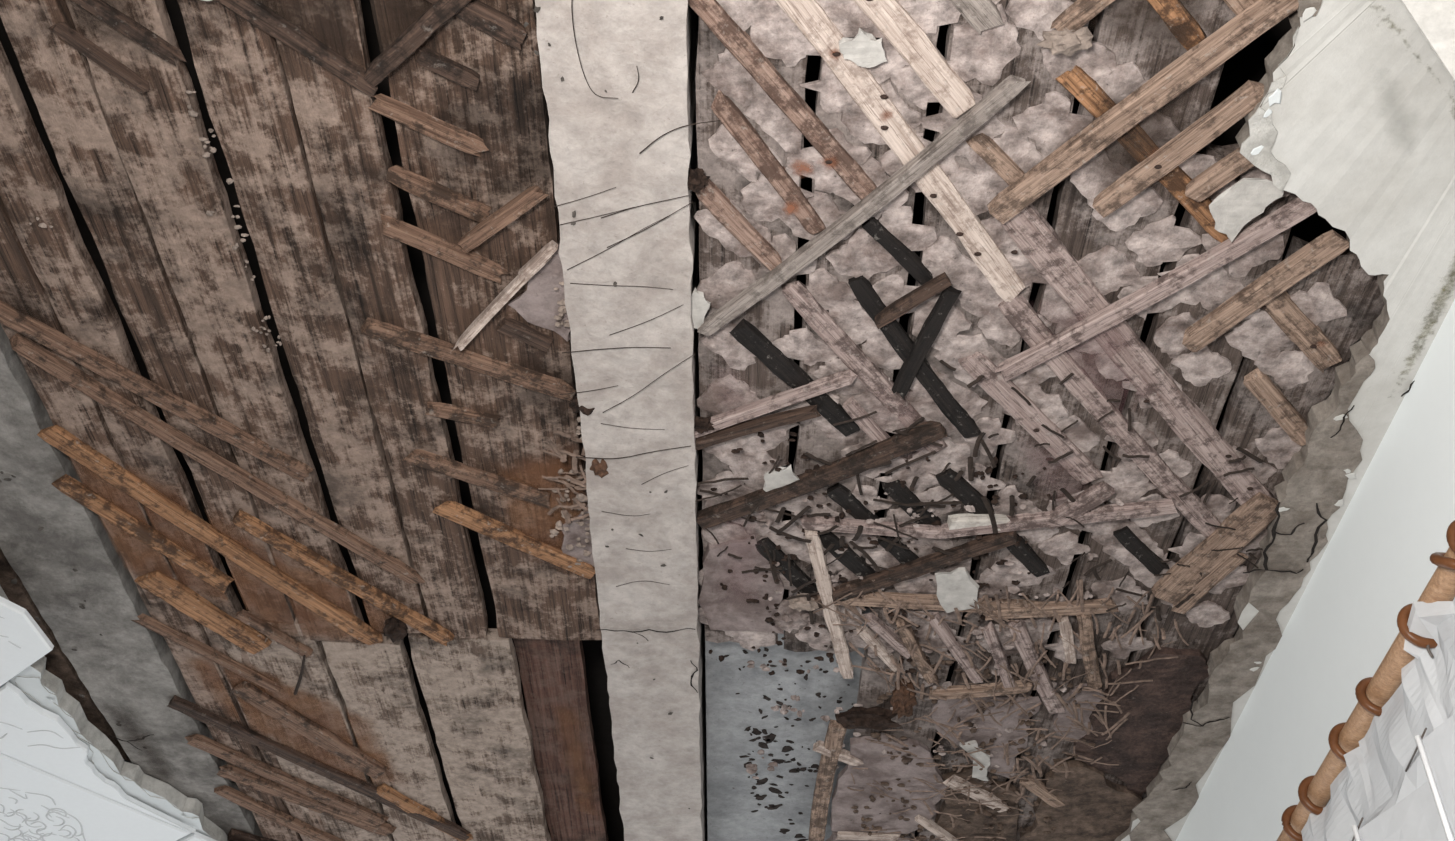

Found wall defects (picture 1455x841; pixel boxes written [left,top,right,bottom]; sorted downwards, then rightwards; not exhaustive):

spalling [694,0,1375,841]